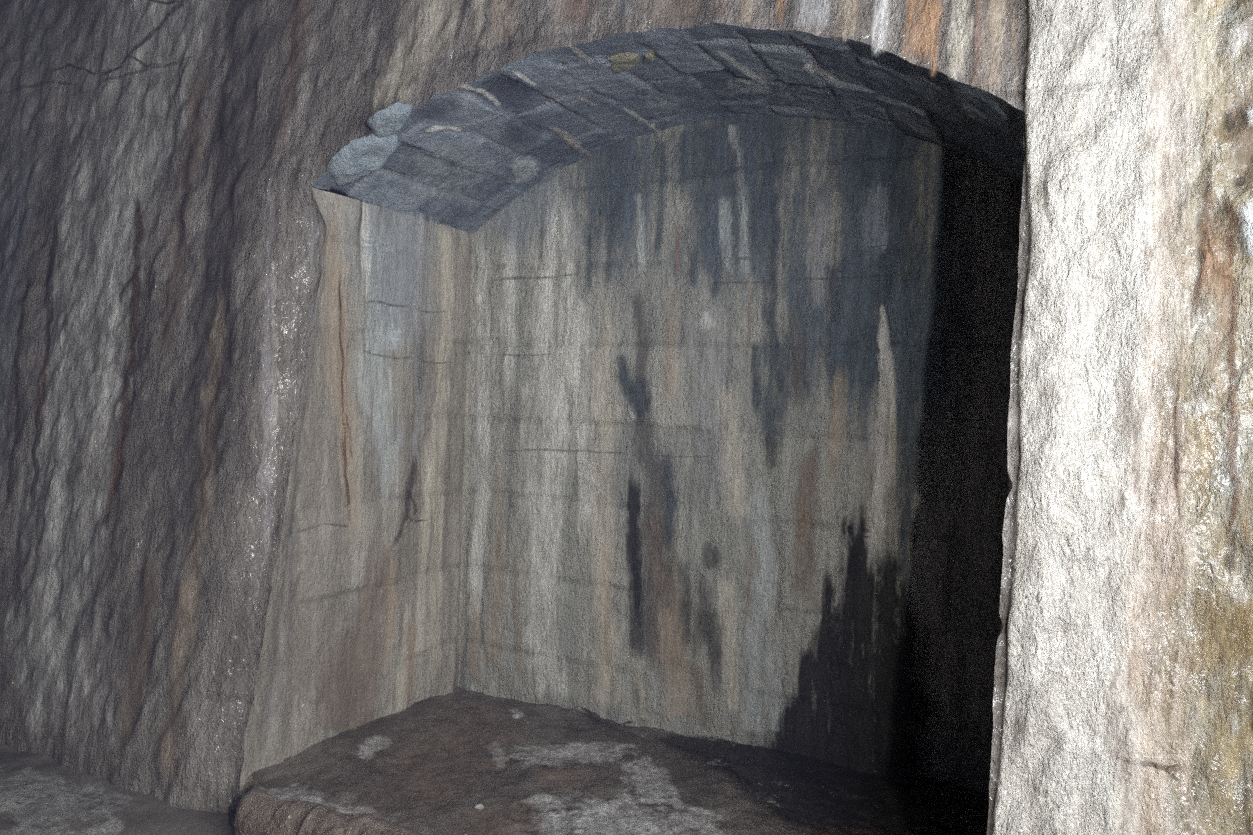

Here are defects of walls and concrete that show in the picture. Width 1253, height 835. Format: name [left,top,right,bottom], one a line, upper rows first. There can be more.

crack [58,0,182,75]
damp [618,296,719,672]
damp [663,53,968,835]
damp [995,0,1189,835]